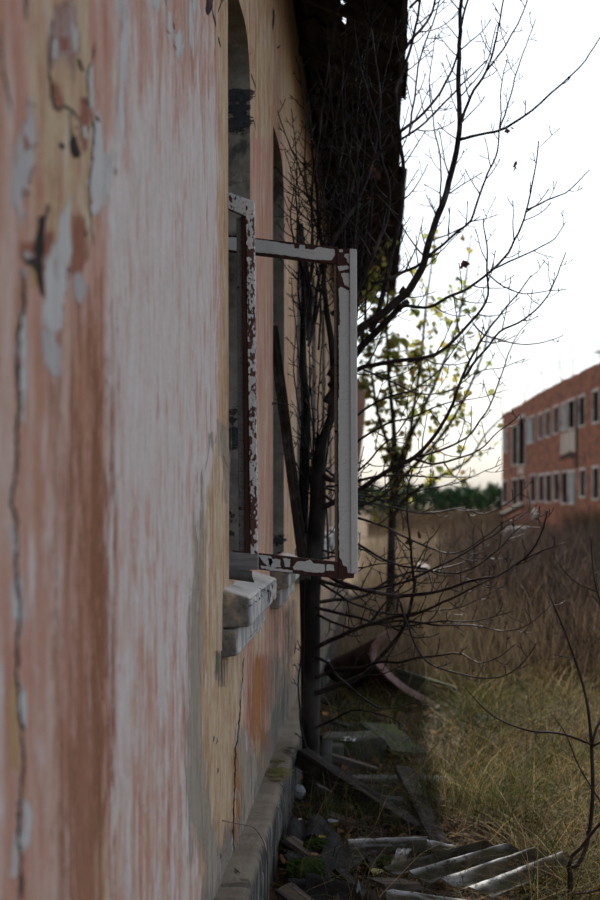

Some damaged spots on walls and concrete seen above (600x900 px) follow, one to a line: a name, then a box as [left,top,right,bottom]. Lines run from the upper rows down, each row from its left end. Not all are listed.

peeling [11,96,41,226]
peeling [20,0,130,379]
peeling [166,0,225,61]
peeling [255,239,351,573]
crack [7,275,32,900]
crack [231,659,244,873]